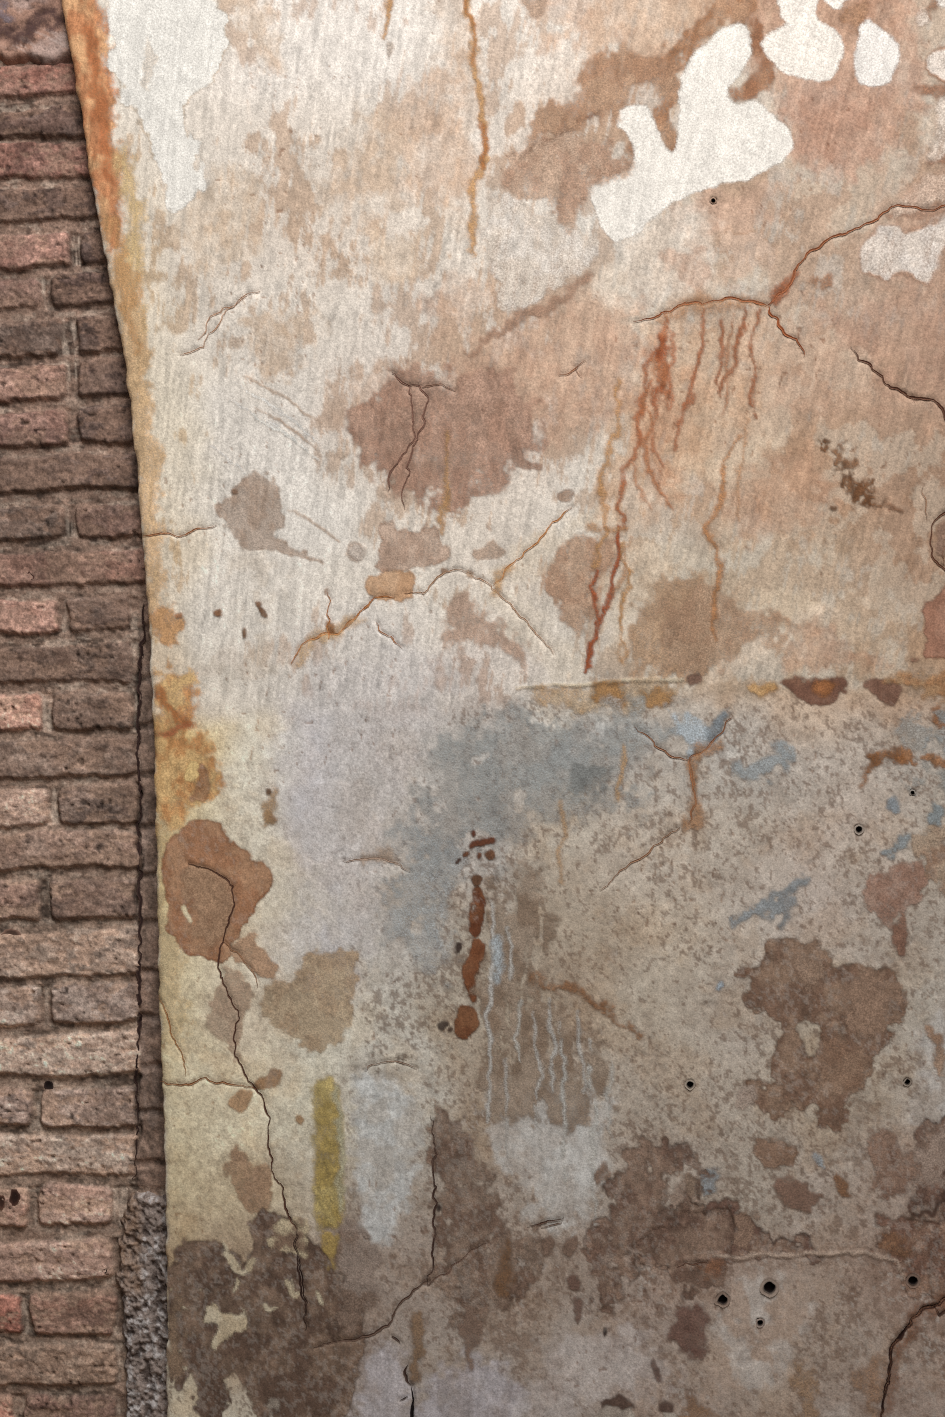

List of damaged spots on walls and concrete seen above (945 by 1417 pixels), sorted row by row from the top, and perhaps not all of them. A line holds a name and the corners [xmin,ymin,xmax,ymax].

peeling [107,0,230,214]
corrosion [463,0,489,253]
peeling [468,0,900,357]
crack [633,204,945,358]
peeling [860,46,945,286]
crack [388,372,456,508]
corrosion [532,309,761,715]
crack [132,604,486,1417]
corrosion [438,830,495,1039]
spalling [115,1086,382,1417]
spalling [409,1311,426,1382]
crack [880,1295,945,1417]